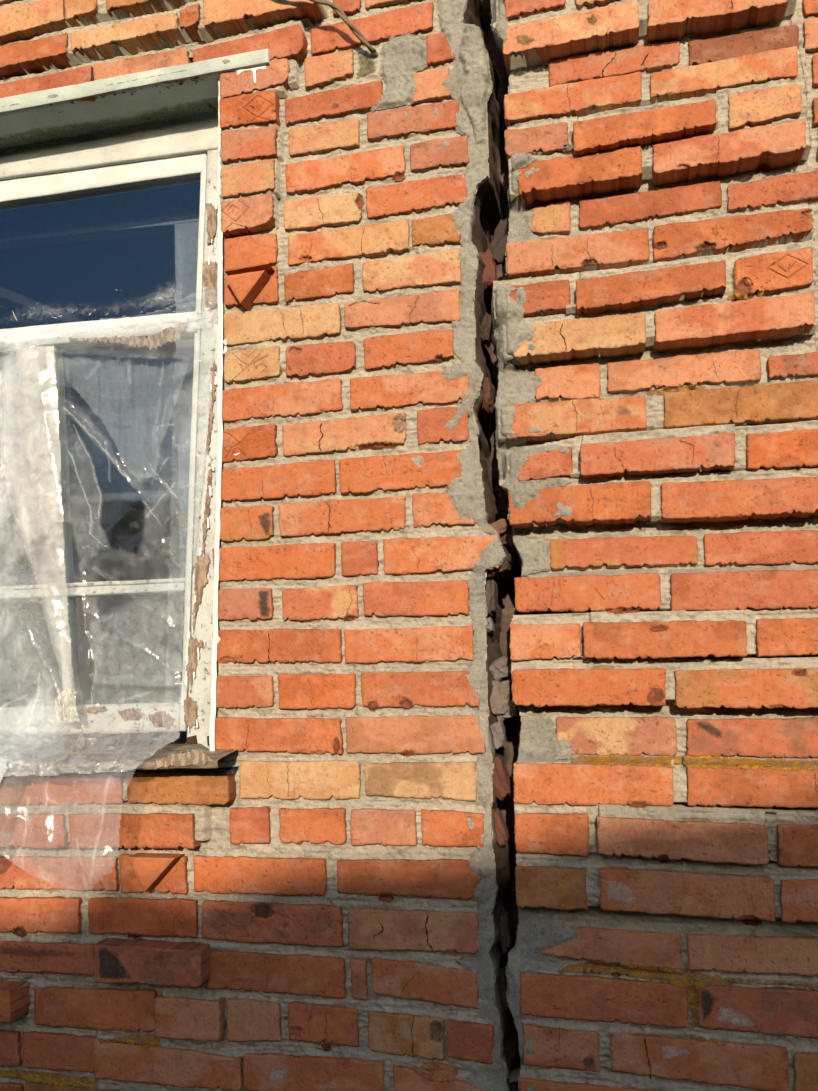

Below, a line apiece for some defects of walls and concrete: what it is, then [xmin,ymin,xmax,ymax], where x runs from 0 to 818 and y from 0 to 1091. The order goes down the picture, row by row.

peeling [202,200,218,310]
peeling [85,359,217,732]
crack [461,0,523,1091]